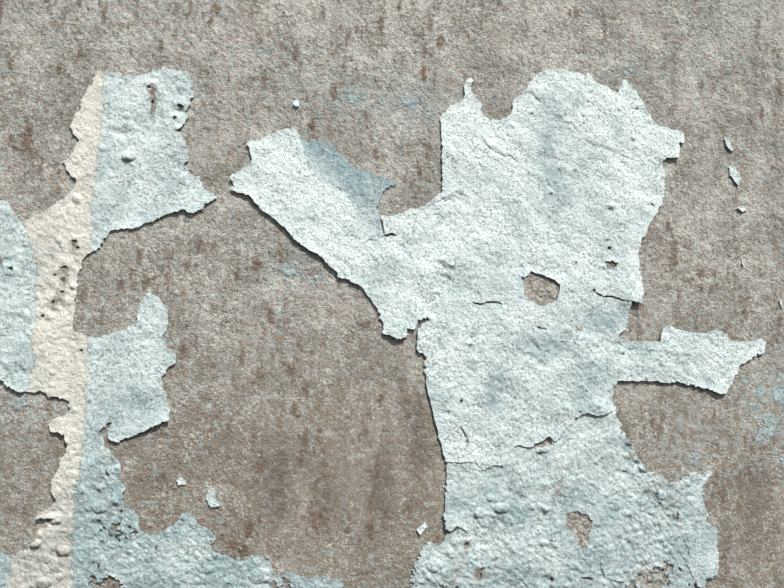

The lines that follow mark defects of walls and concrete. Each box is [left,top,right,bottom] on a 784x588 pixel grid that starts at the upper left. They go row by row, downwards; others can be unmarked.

peeling [0,66,344,588]
peeling [230,65,766,588]
peeling [745,369,784,442]